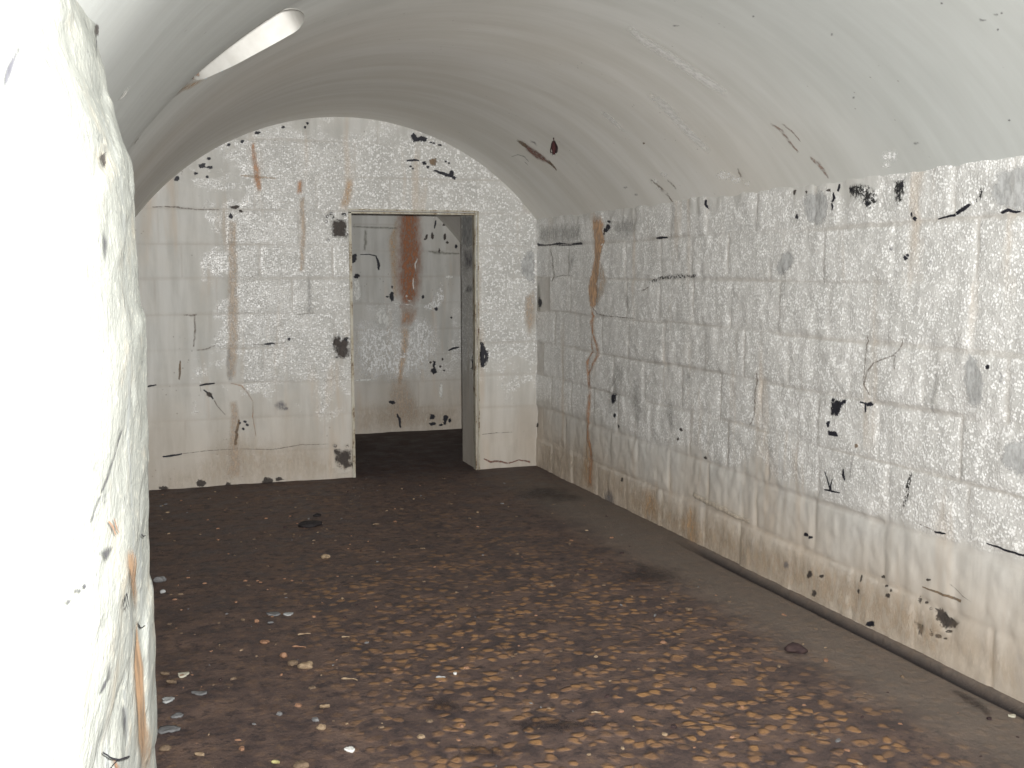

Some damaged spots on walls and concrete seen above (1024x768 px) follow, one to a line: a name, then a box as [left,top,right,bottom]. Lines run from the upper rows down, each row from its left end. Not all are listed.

rust [519,141,556,170]
peeling [793,184,877,224]
peeling [325,212,348,236]
rust [401,215,419,322]
rust [586,220,604,383]
peeling [333,336,350,358]
peeling [826,398,846,437]
peeling [333,445,353,469]
rust [128,555,137,594]
spalling [917,596,959,640]
rust [135,632,148,753]